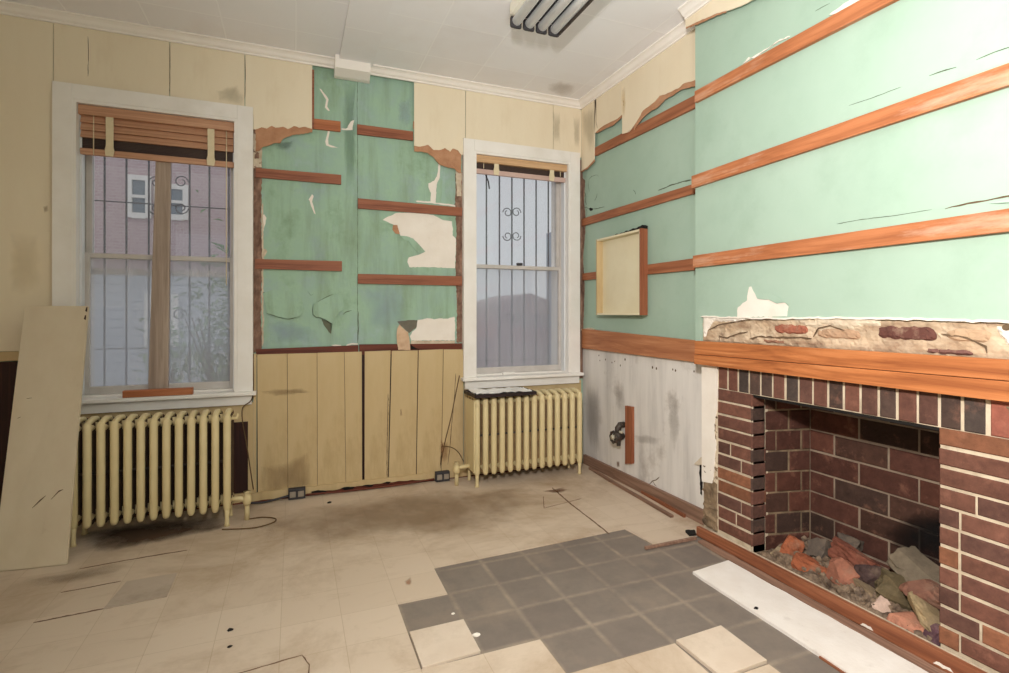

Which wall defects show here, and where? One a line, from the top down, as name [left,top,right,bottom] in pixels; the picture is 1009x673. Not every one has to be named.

peeling [325,120,354,148]
crack [945,195,1009,209]
spalling [253,130,267,353]
peeling [380,164,462,350]
spalling [700,287,1009,359]
crack [240,655,310,673]